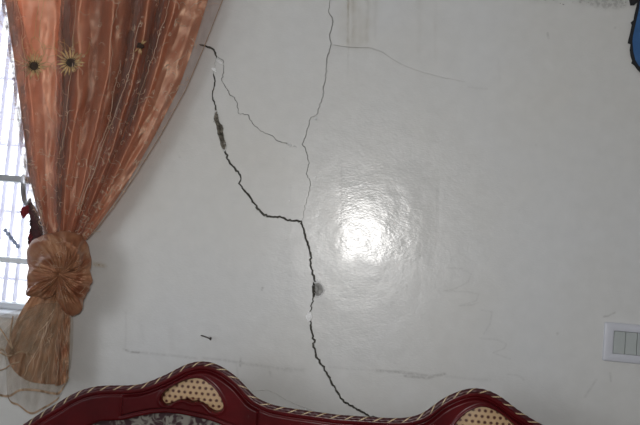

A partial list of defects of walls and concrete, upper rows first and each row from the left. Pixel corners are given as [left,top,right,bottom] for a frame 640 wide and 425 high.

crack [199,1,454,417]